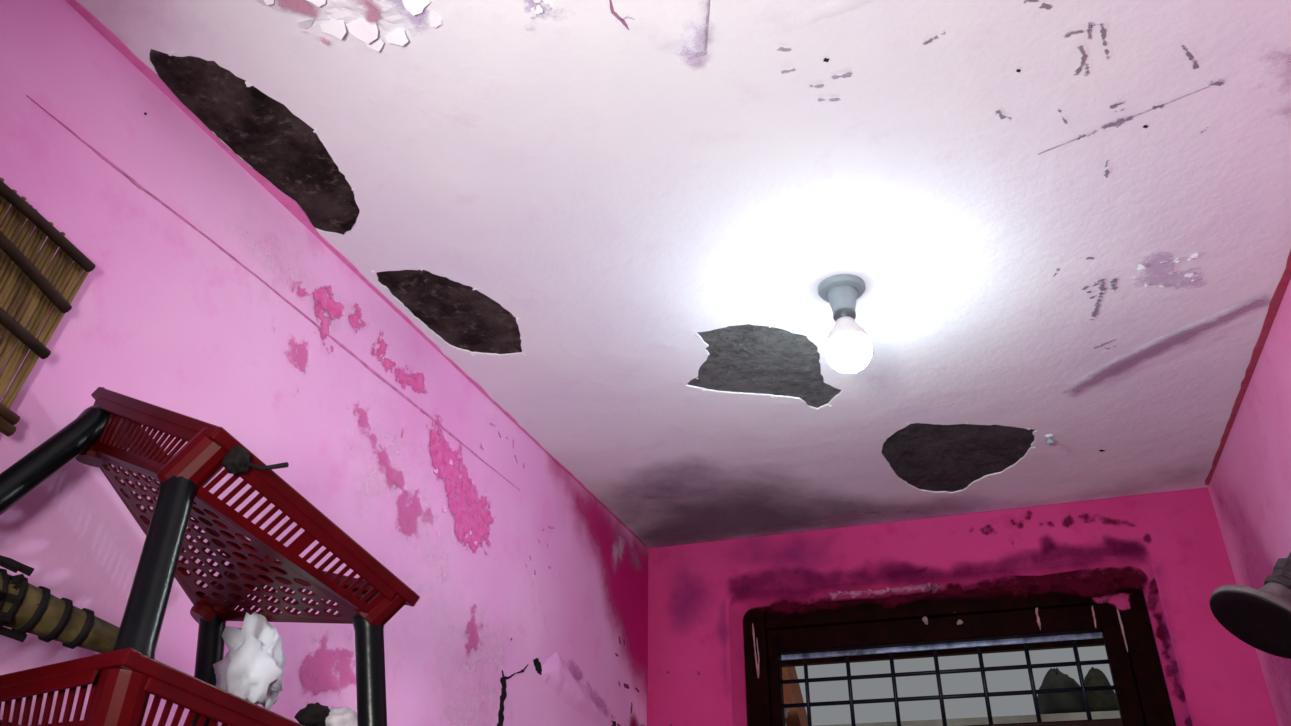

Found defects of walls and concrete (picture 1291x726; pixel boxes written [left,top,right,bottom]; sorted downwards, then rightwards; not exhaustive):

peeling [255,0,442,52]
spalling [150,49,361,235]
peeling [287,282,365,372]
peeling [371,330,427,393]
spalling [371,268,526,357]
spalling [687,324,841,408]
peeling [354,405,494,554]
water stain [643,481,951,540]
spalling [882,423,1036,495]
water stain [1011,511,1150,554]
crack [497,664,529,726]